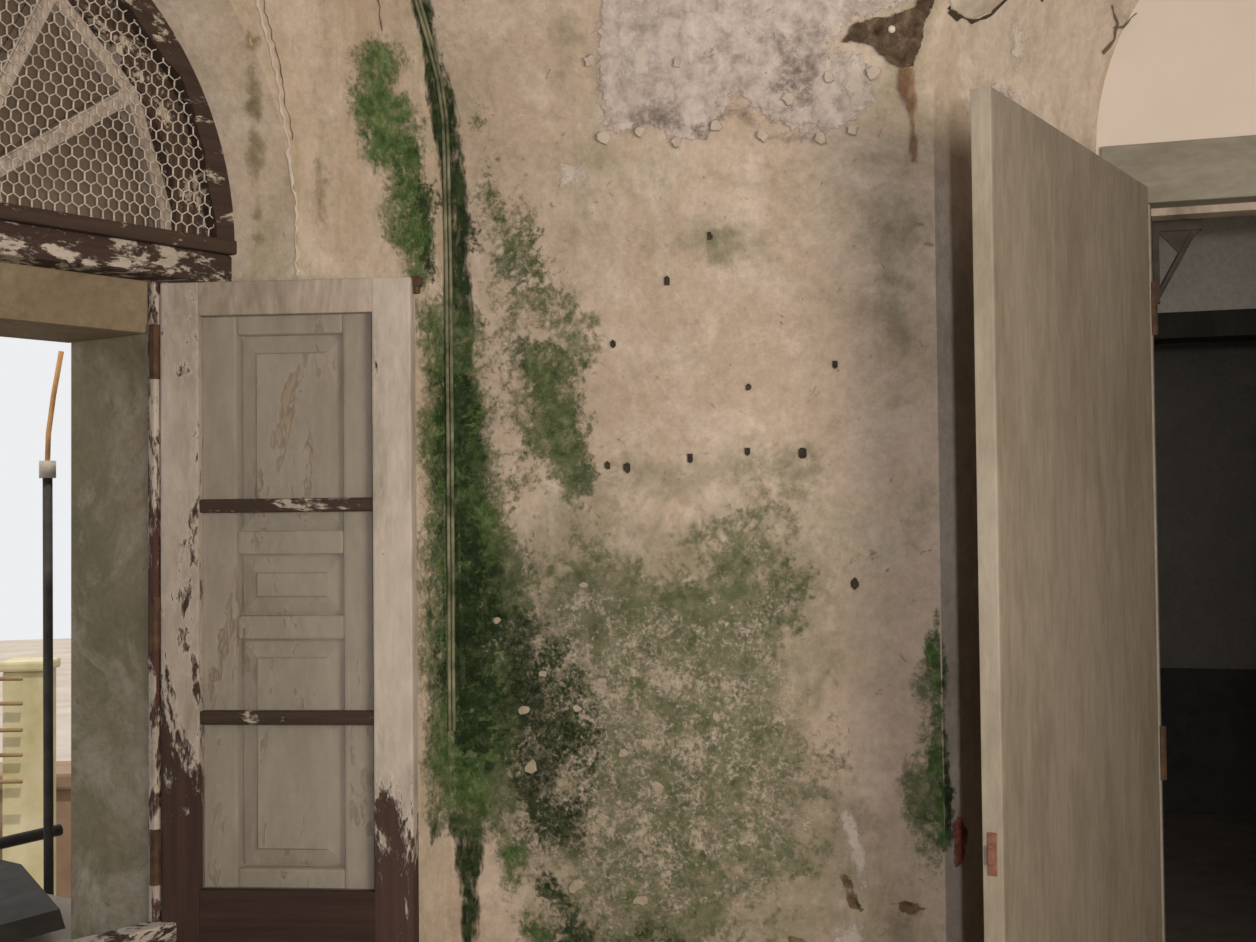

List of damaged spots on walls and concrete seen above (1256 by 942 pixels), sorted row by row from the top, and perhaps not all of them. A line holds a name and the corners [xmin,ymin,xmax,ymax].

flaking render [583,0,935,148]
rust [899,68,917,162]
damp [350,0,845,942]
damp [902,611,956,859]
peeling [833,809,868,942]
flaking render [892,901,925,915]